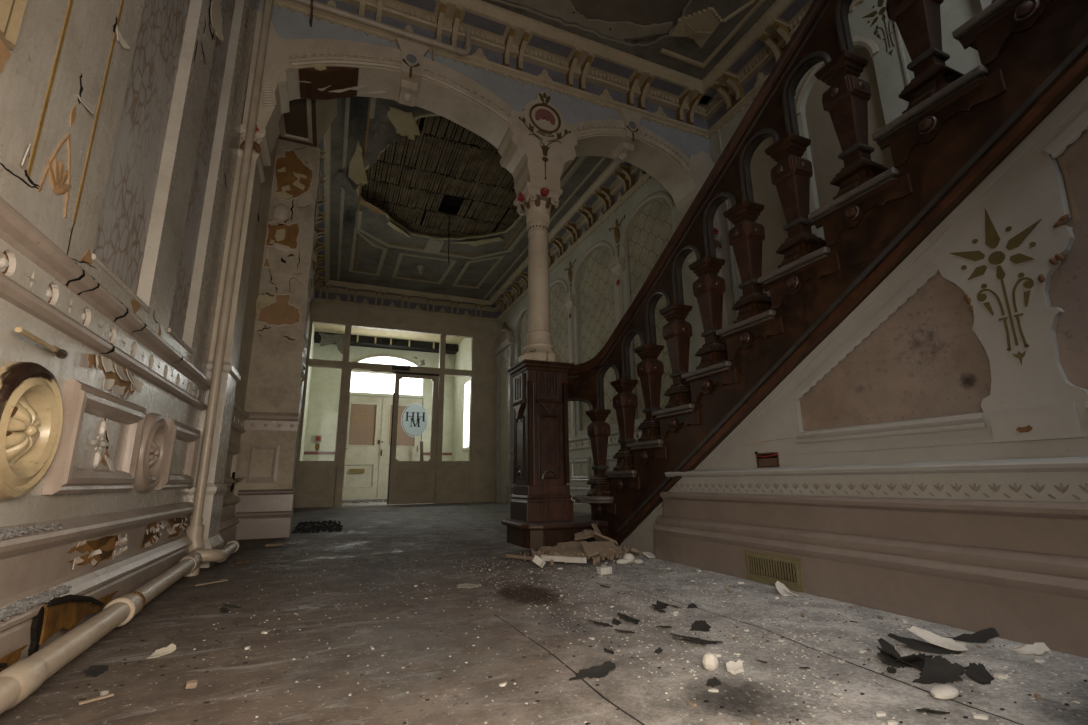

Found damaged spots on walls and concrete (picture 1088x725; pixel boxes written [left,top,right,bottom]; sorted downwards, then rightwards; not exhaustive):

flaking render [297,64,387,100]
peeling [387,106,440,141]
spalling [348,140,522,246]
flaking render [255,147,459,386]
peeling [67,516,188,569]